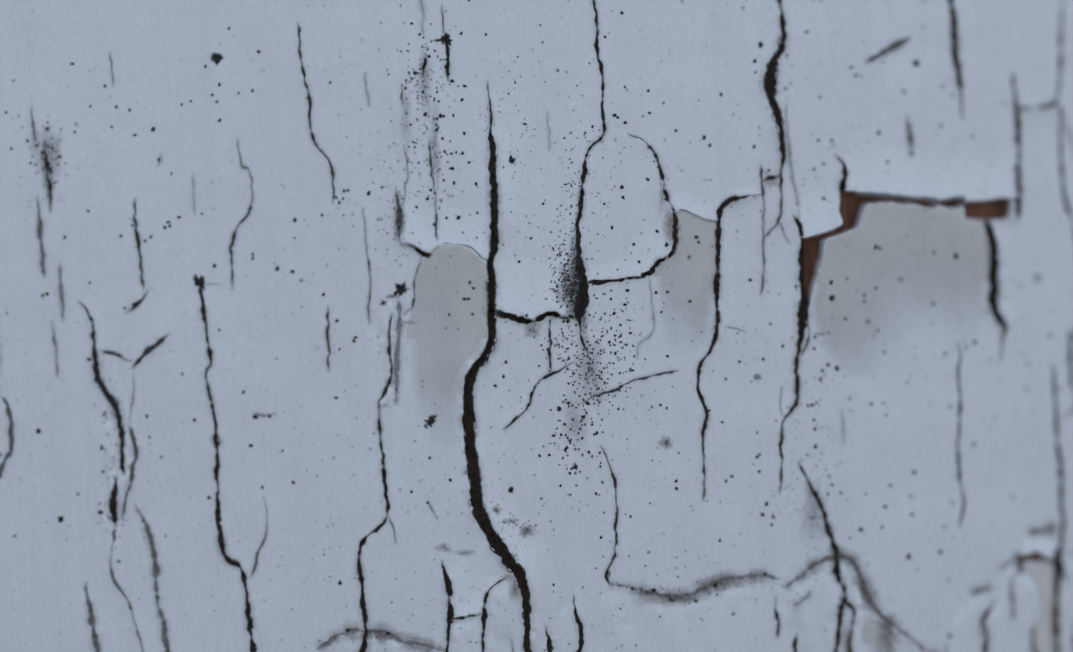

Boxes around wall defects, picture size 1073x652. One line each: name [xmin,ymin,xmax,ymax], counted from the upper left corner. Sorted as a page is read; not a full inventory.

crack [298,27,335,199]
peeling [760,77,780,151]
crack [948,0,962,115]
crack [0,399,14,478]
crack [31,113,170,652]
crack [199,288,266,652]
crack [324,0,679,652]
peeling [377,105,1063,619]
crack [593,0,923,652]
crack [984,220,1007,356]
crack [977,332,1073,652]
peeling [1019,533,1059,652]